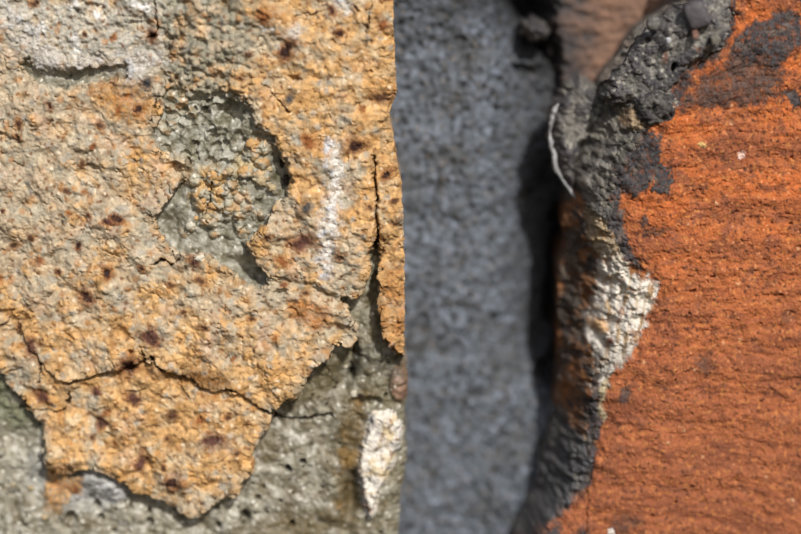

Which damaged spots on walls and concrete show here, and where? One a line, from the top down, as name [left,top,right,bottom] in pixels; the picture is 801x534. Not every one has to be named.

spalling [21,58,128,89]
crack [372,156,380,247]
spalling [0,84,408,534]
damp [583,206,660,420]
crack [25,393,72,413]
crack [140,351,331,419]